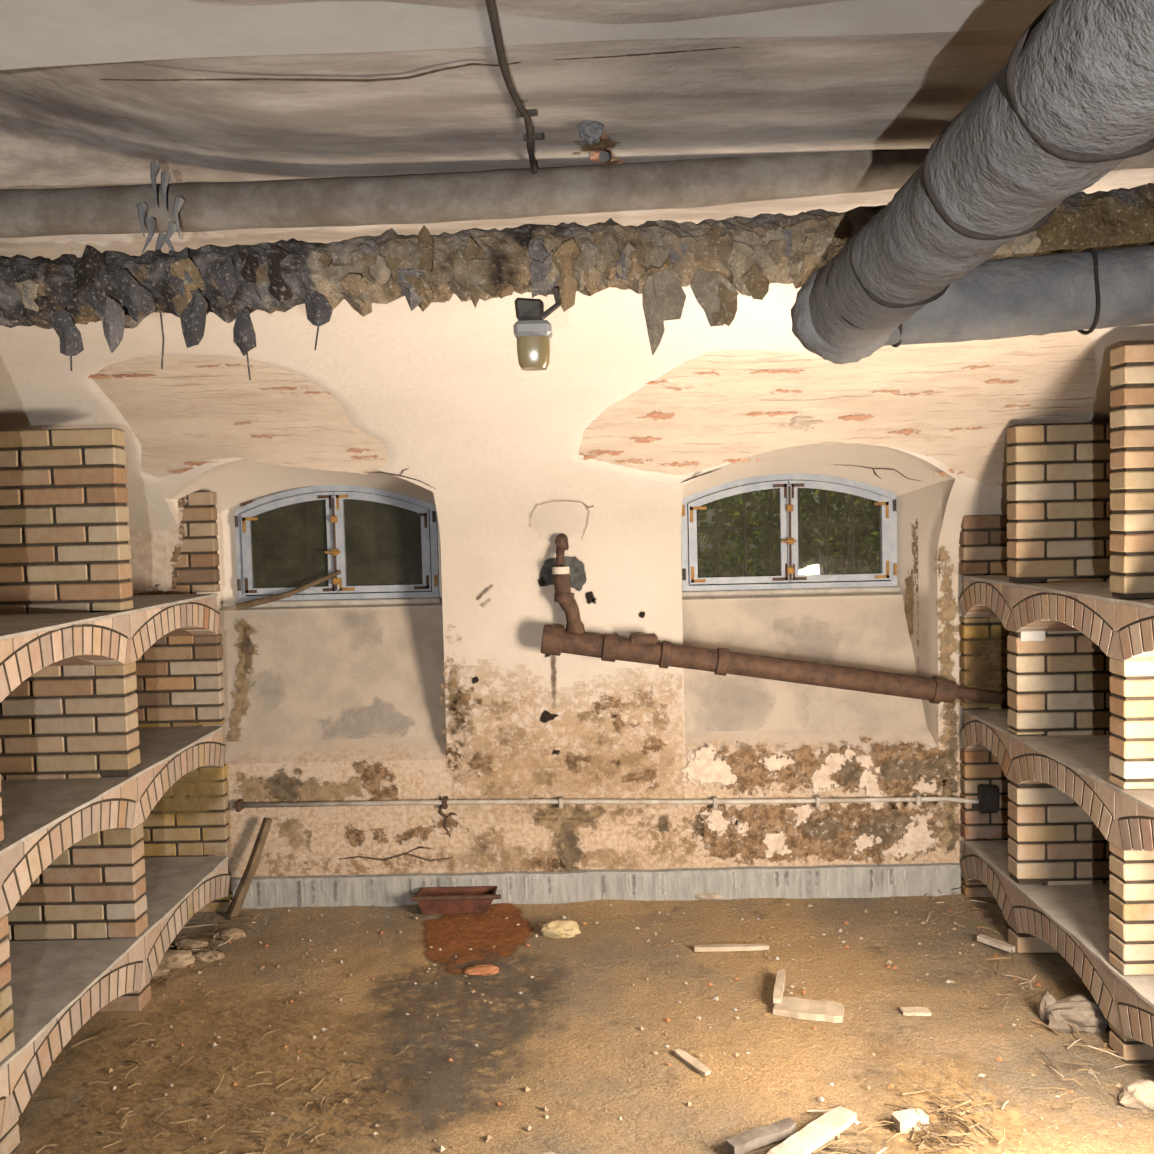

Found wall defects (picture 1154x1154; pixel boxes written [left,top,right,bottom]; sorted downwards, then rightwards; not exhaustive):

peeling [463,237,489,308]
peeling [498,284,514,298]
peeling [528,226,816,356]
peeling [1013,231,1054,257]
flaking render [14,225,434,478]
flaking render [578,330,1097,487]
crack [846,465,918,481]
damp [443,660,667,813]
damp [612,804,707,860]